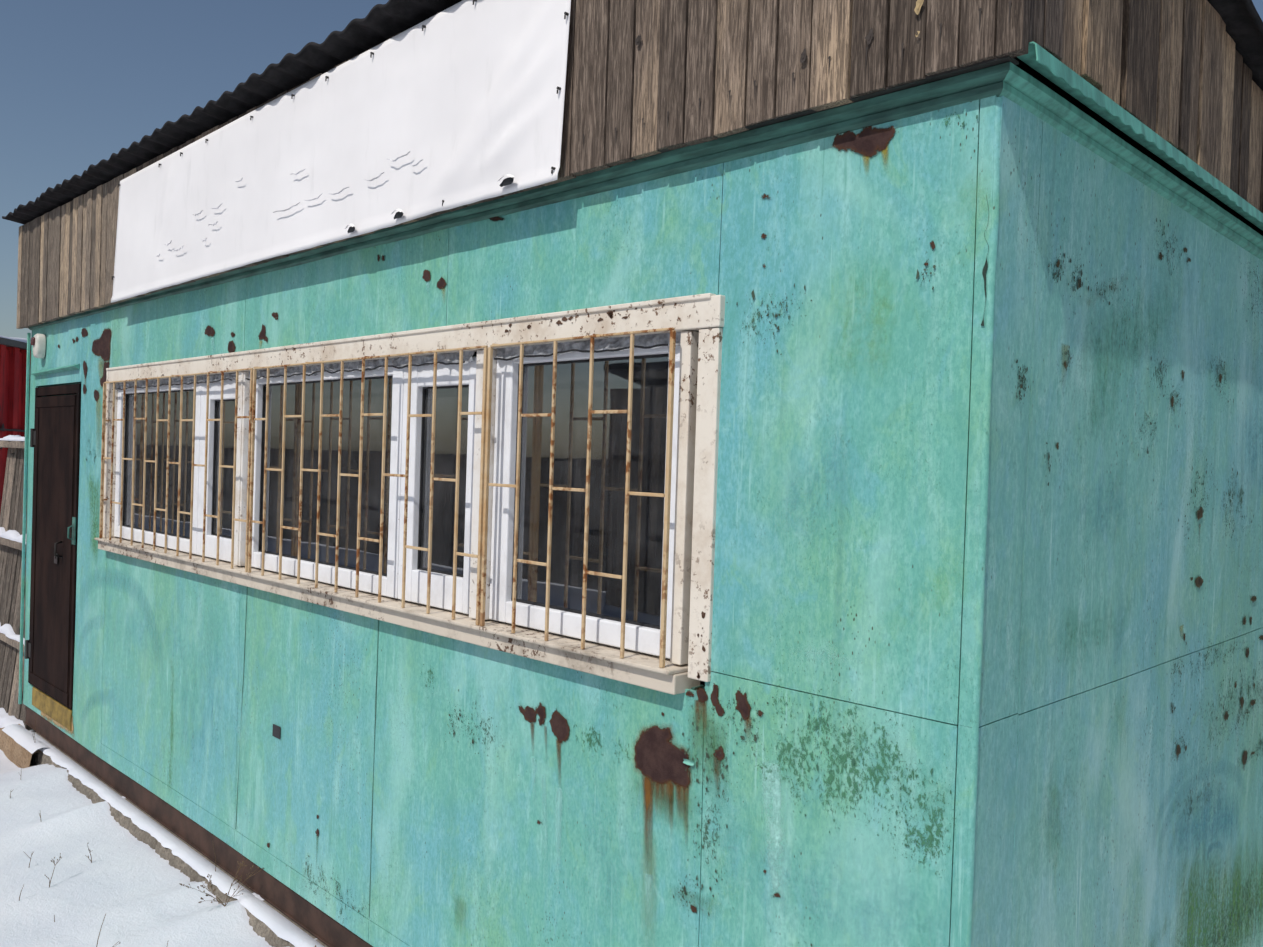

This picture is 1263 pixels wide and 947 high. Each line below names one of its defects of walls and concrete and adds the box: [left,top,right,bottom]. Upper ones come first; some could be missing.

rust [832,126,895,162]
rust [58,328,111,401]
rust [686,683,764,724]
rust [1224,681,1256,721]
rust [519,703,570,759]
rust [634,712,691,834]
rust [713,745,724,761]